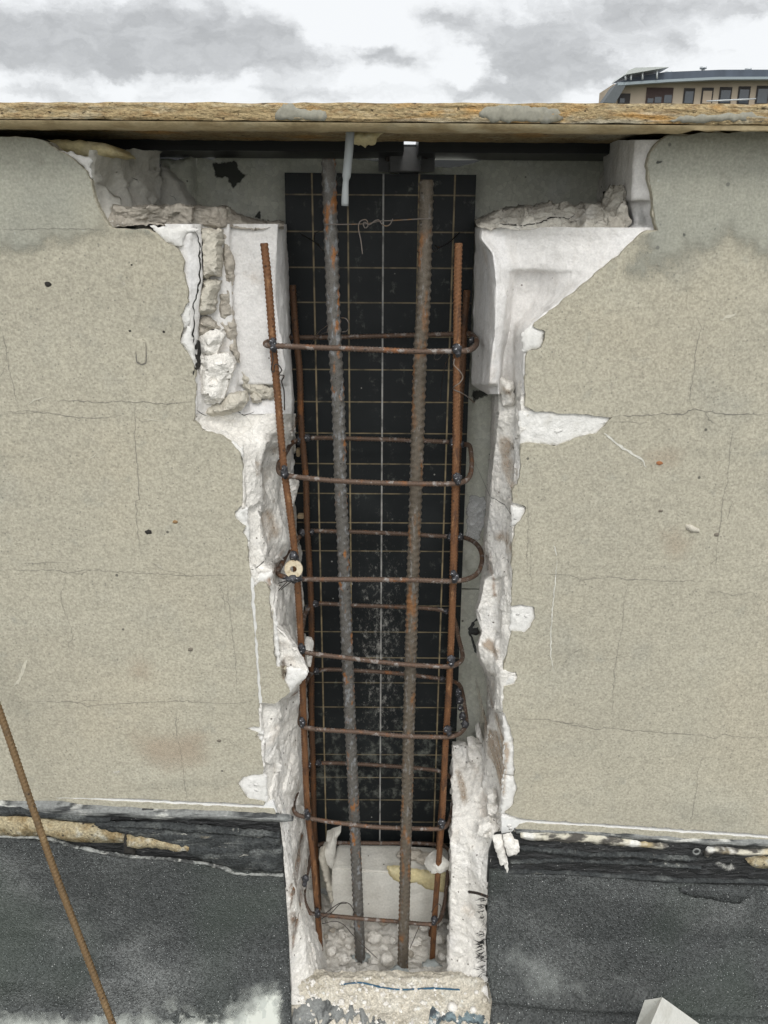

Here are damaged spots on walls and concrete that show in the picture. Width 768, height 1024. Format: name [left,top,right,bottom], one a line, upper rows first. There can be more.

crack [0,333,270,800]
spalling [150,224,328,1005]
spalling [446,227,654,998]
crack [477,319,765,829]